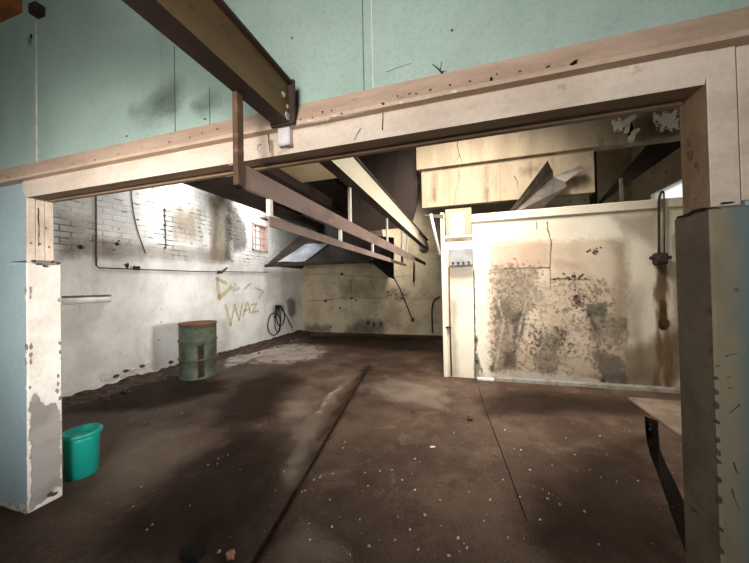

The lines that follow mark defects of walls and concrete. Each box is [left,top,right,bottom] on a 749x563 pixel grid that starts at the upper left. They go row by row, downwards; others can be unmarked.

peeling [652,109,680,133]
leakage [211,195,246,260]
crack [503,221,584,287]
corrosion [654,265,668,326]
leakage [479,371,610,383]
leakage [622,331,679,386]
flaking render [0,374,62,514]